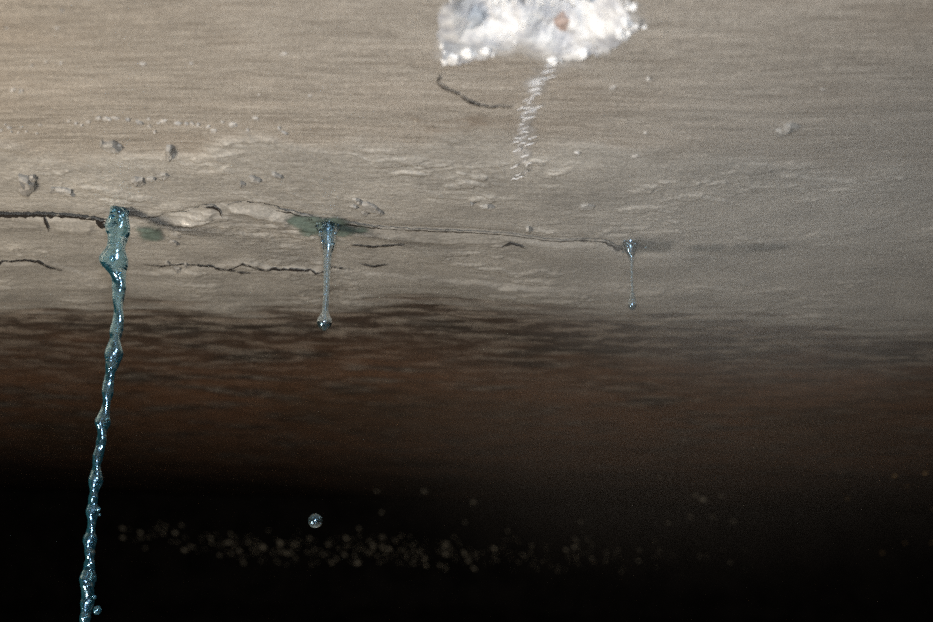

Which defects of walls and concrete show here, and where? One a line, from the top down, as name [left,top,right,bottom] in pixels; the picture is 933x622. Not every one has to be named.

crack [436,75,513,108]
efflorescence [510,65,555,181]
peeling [17,173,37,197]
crack [0,214,106,232]
crack [0,259,62,271]
water stain [287,216,367,331]
crack [143,223,624,275]
water stain [79,206,161,622]
water stain [120,522,625,573]